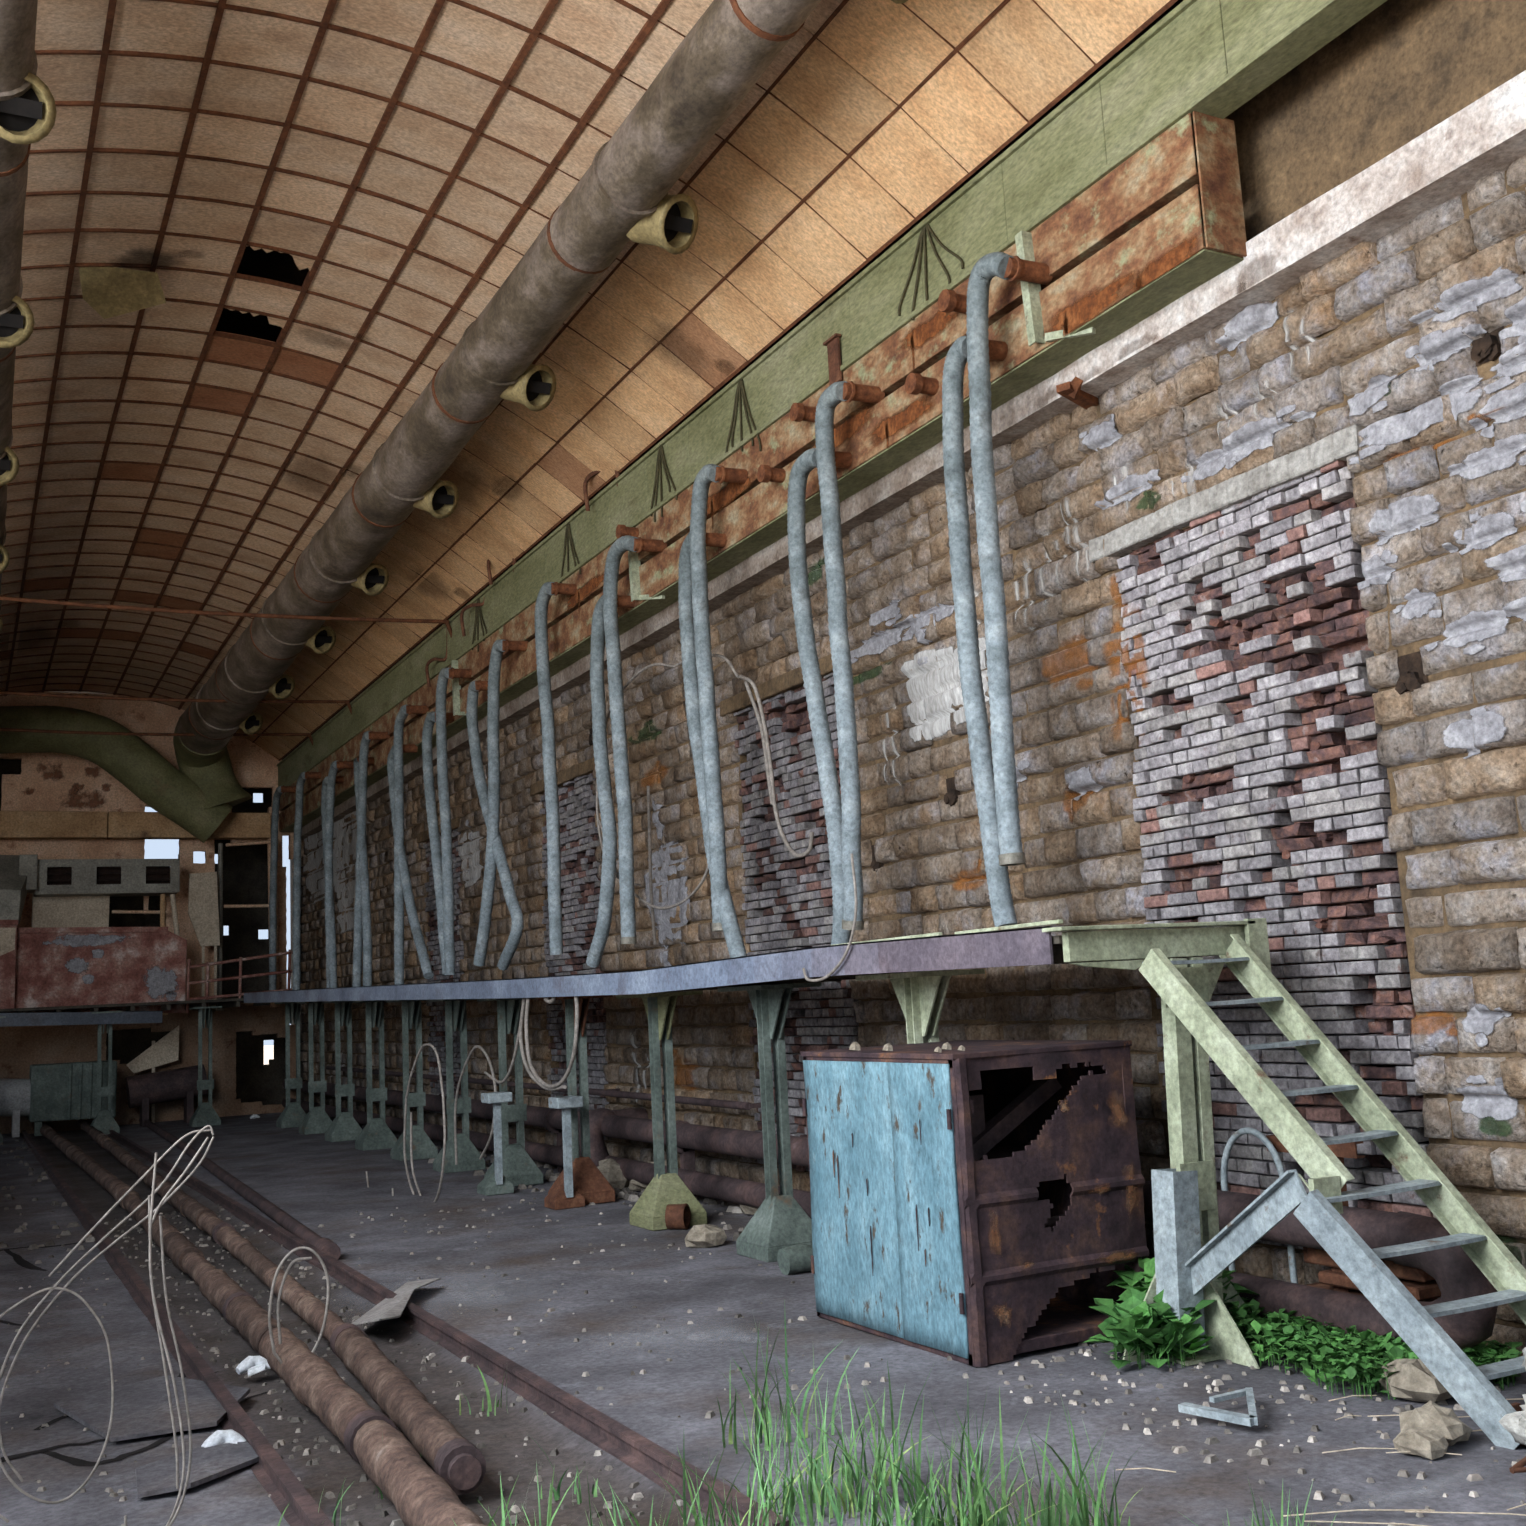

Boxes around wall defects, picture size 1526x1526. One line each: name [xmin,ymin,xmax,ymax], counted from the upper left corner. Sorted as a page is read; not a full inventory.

corrosion [834,398,933,449]
corrosion [902,310,958,370]
corrosion [1044,236,1197,342]
peeling [1347,267,1526,479]
corrosion [707,477,751,528]
spalling [1182,492,1440,797]
peeling [1393,500,1526,695]
peeling [1443,705,1507,759]
spalling [736,687,833,938]
spalling [1164,823,1408,958]
crack [0,1241,85,1271]
crack [1,1415,179,1466]